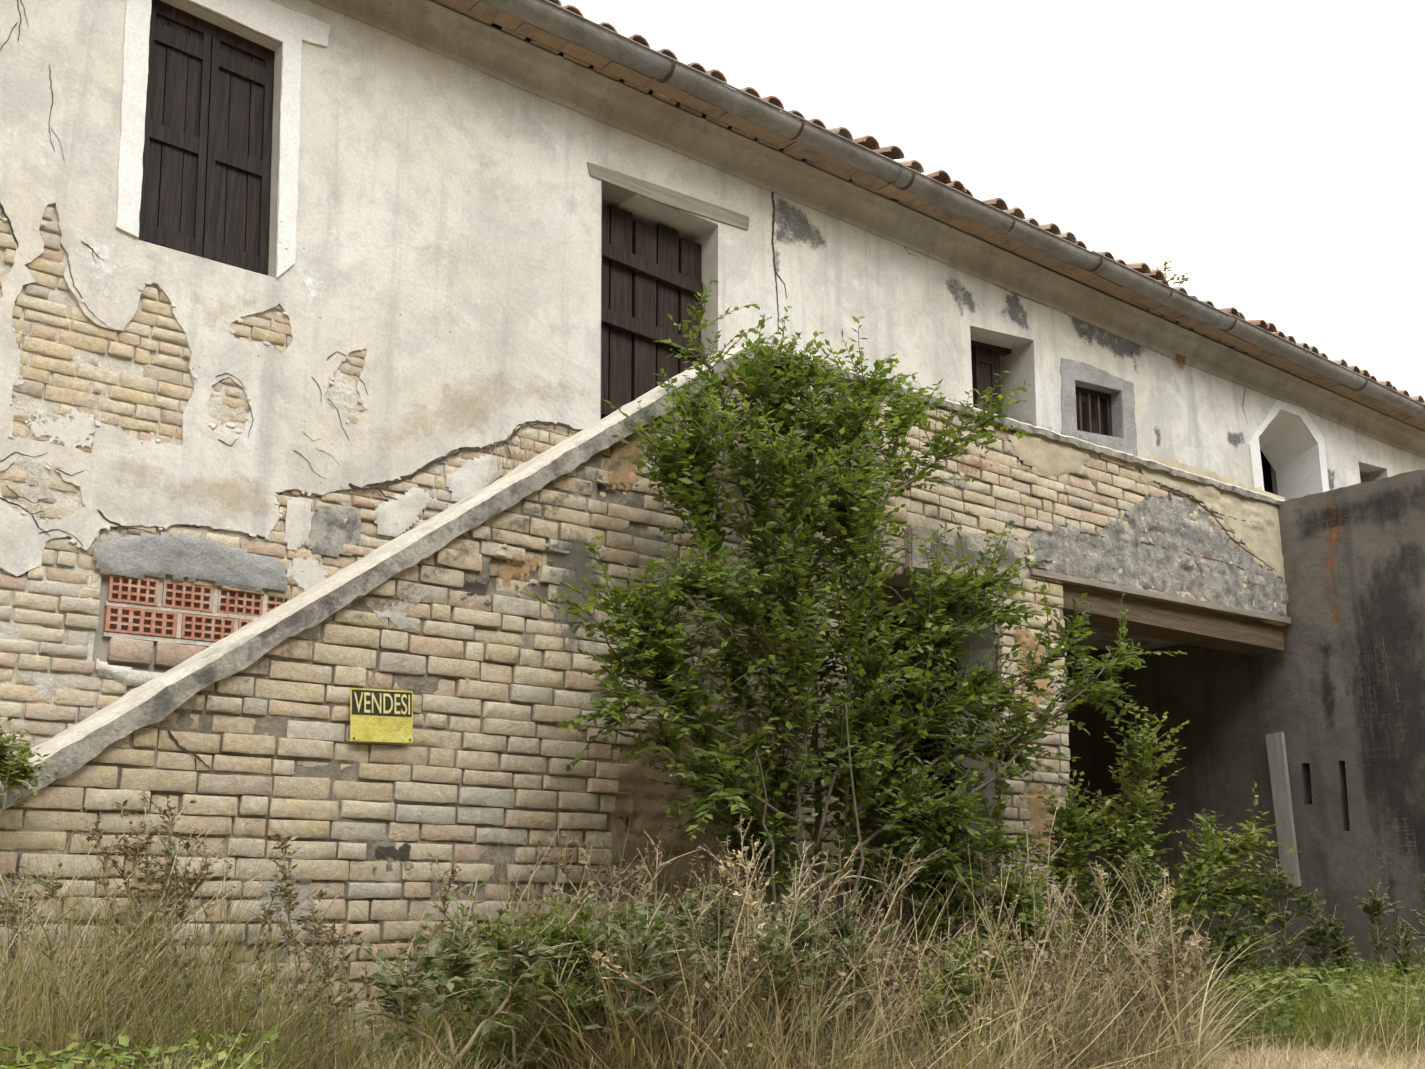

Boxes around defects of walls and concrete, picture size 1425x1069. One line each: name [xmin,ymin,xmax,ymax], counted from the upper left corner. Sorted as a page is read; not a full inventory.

crack [0,0,28,50]
crack [49,65,65,163]
flaking render [0,203,254,548]
flaking render [230,304,293,355]
flaking render [312,349,368,438]
crack [771,192,787,332]
water stain [775,198,825,271]
water stain [946,279,974,312]
water stain [1002,294,1028,329]
water stain [1072,317,1143,368]
spalling [460,543,550,605]
water stain [1328,548,1425,902]